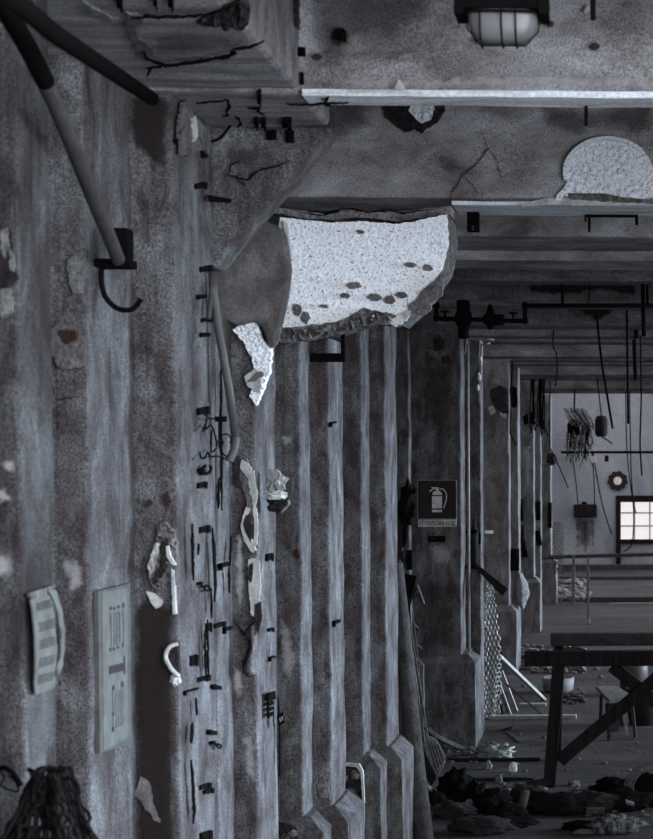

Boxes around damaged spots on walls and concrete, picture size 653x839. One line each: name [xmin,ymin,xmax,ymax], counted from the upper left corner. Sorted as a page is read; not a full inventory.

crack [130,5,231,20]
spalling [196,0,250,31]
crack [143,40,264,77]
crack [196,99,265,128]
crack [286,96,349,107]
spalling [382,105,445,134]
crack [291,130,503,216]
peeling [0,226,20,319]
spalling [233,206,458,405]
spalling [146,522,179,614]
peeling [233,455,263,635]
peeling [134,777,160,823]